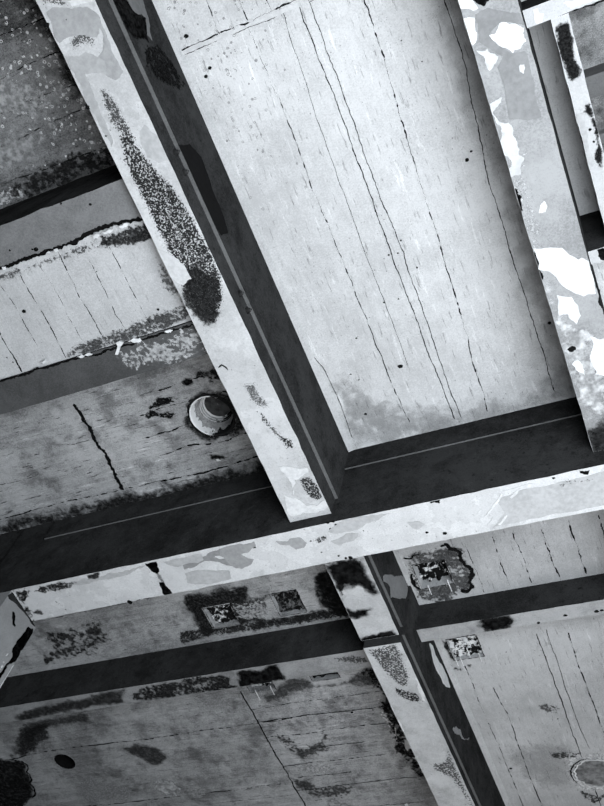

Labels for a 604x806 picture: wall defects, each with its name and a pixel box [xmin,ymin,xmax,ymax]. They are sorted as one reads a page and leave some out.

peeling [458,0,541,177]
water stain [0,0,224,370]
crack [182,0,461,422]
crack [364,0,487,410]
crack [444,0,554,390]
peeling [533,247,596,324]
crack [0,404,258,520]
water stain [184,366,245,442]
peeling [326,513,390,545]
spalling [269,589,307,617]
water stain [133,675,237,700]
water stain [334,645,425,780]